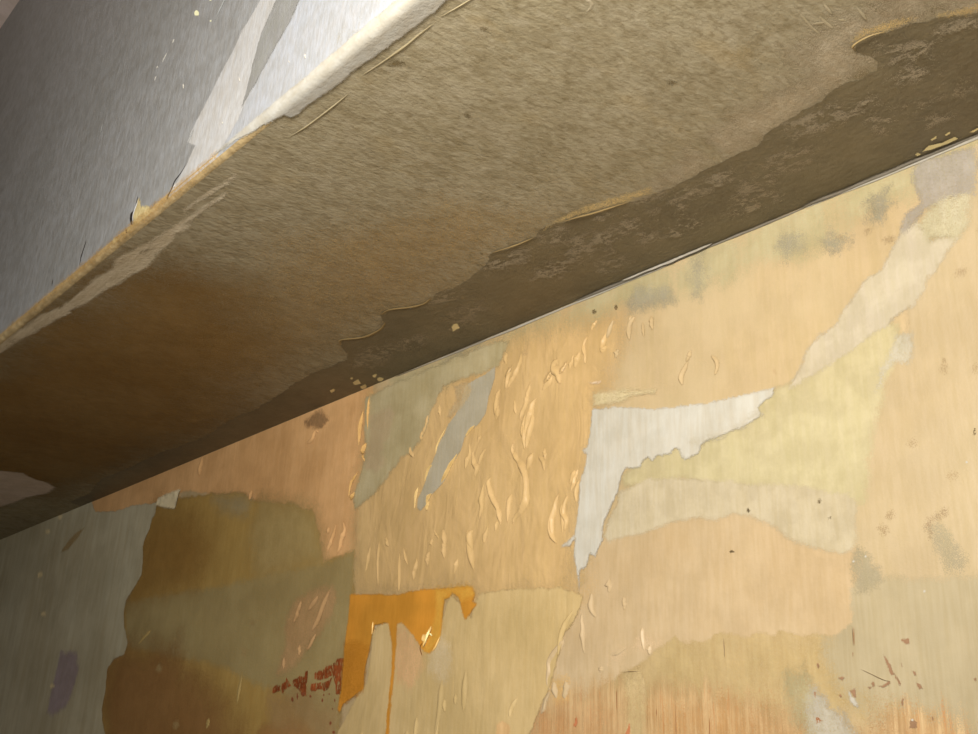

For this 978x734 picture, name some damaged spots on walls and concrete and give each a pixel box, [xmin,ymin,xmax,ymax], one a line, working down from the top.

flaking render [71,0,978,511]
leakage [389,140,978,387]